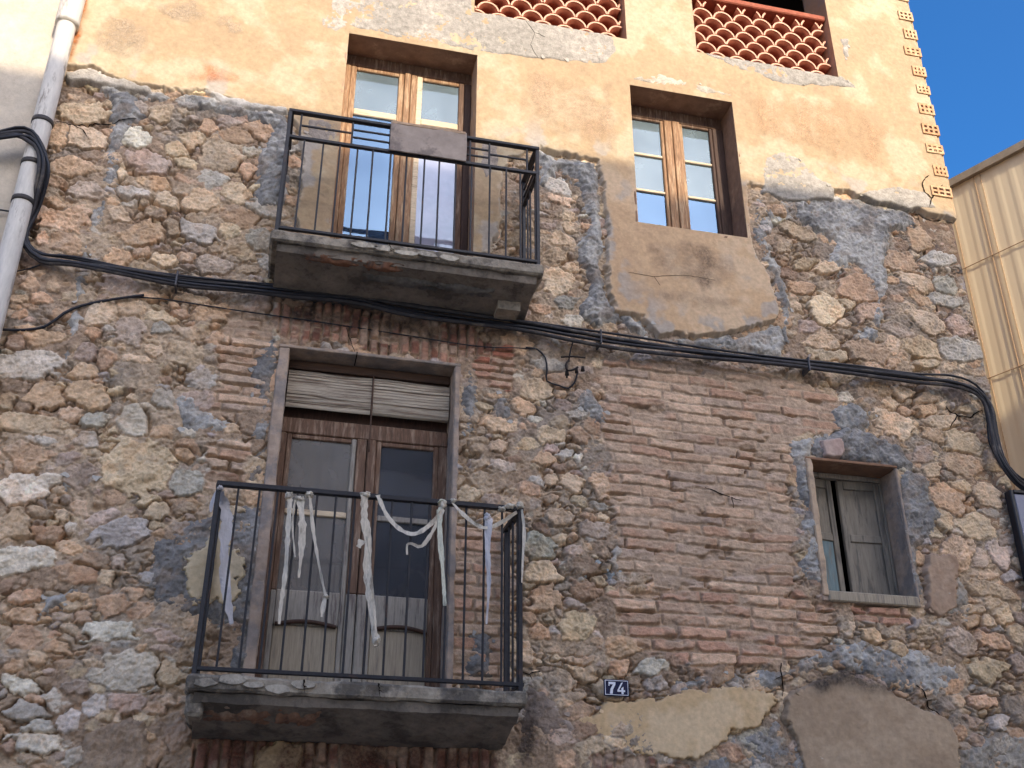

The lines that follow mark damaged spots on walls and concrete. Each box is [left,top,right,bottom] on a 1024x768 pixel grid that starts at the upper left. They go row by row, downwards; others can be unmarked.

flaking render [322,0,616,63]
flaking render [65,68,152,97]
flaking render [204,90,288,116]
flaking render [760,152,835,202]
flaking render [858,187,935,215]
crack [946,406,982,427]
peeling [819,434,845,460]
peeling [181,520,247,612]